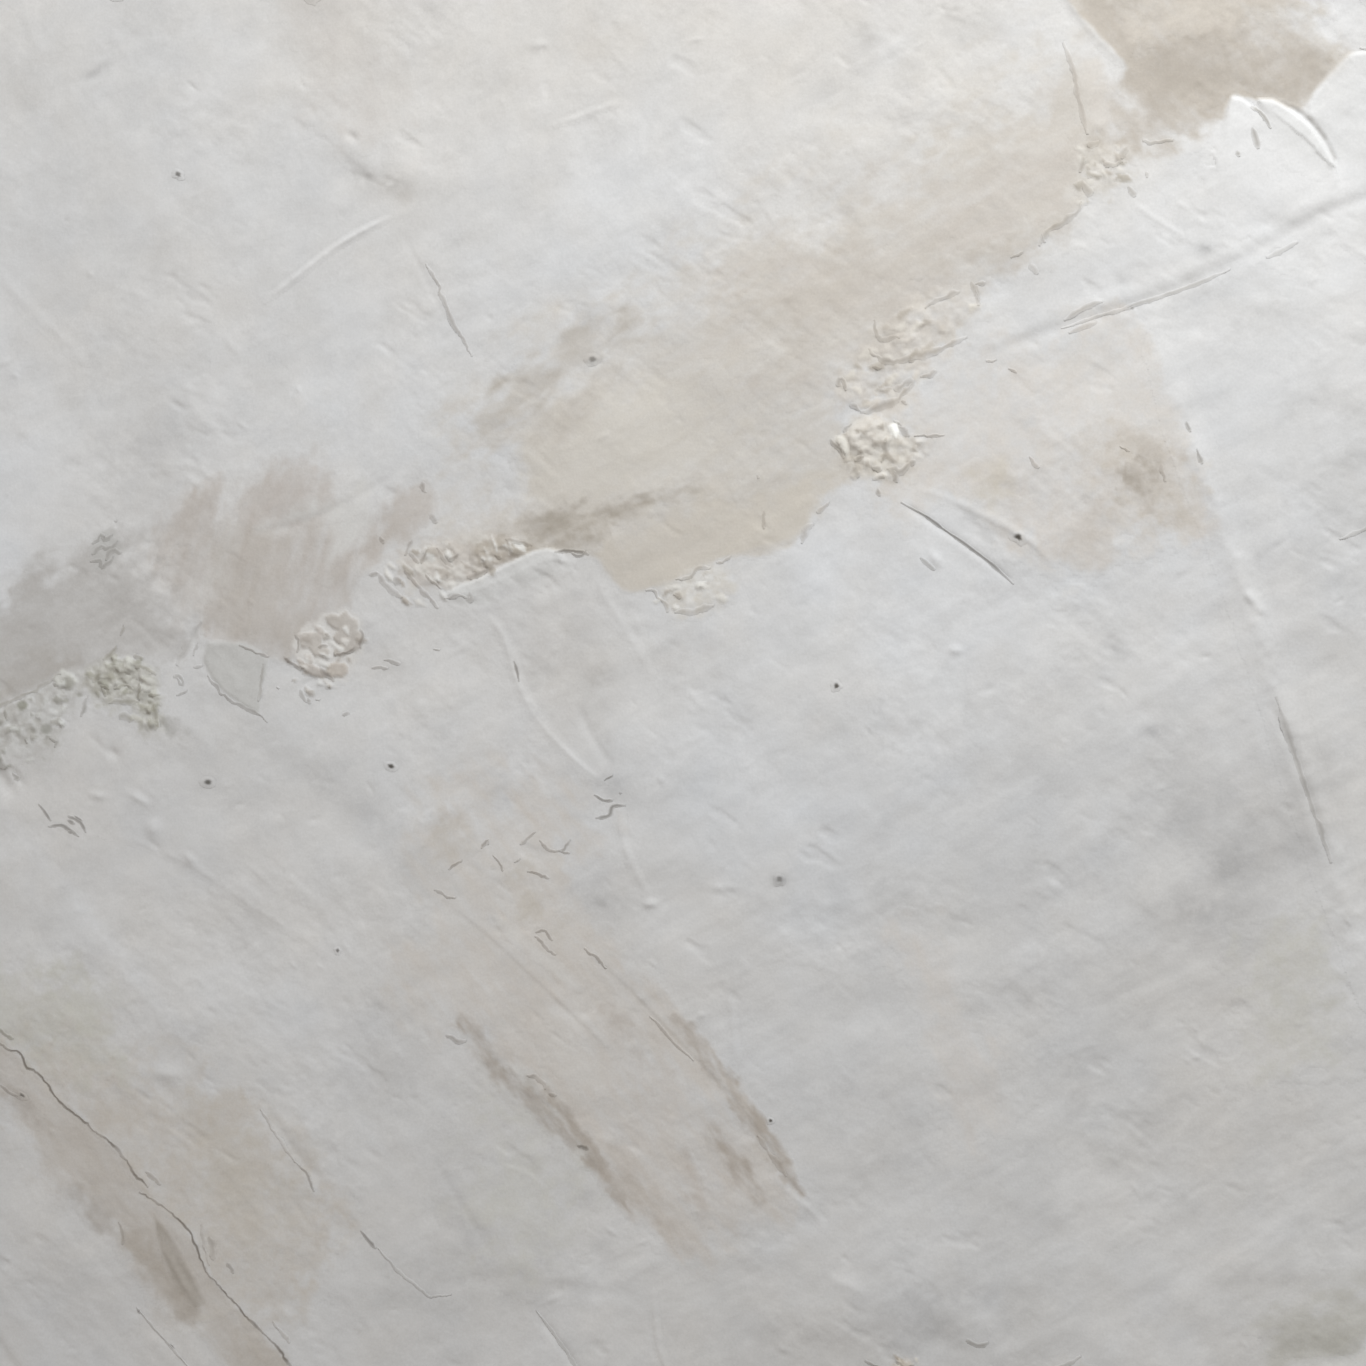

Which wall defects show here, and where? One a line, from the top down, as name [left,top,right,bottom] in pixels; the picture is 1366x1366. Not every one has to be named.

leakage [0,0,1358,699]
spalling [369,513,620,613]
spalling [0,606,401,793]
leakage [360,728,809,1285]
crack [0,1027,293,1366]
crack [260,1109,315,1192]
crack [360,1230,451,1299]
crack [536,1310,577,1366]